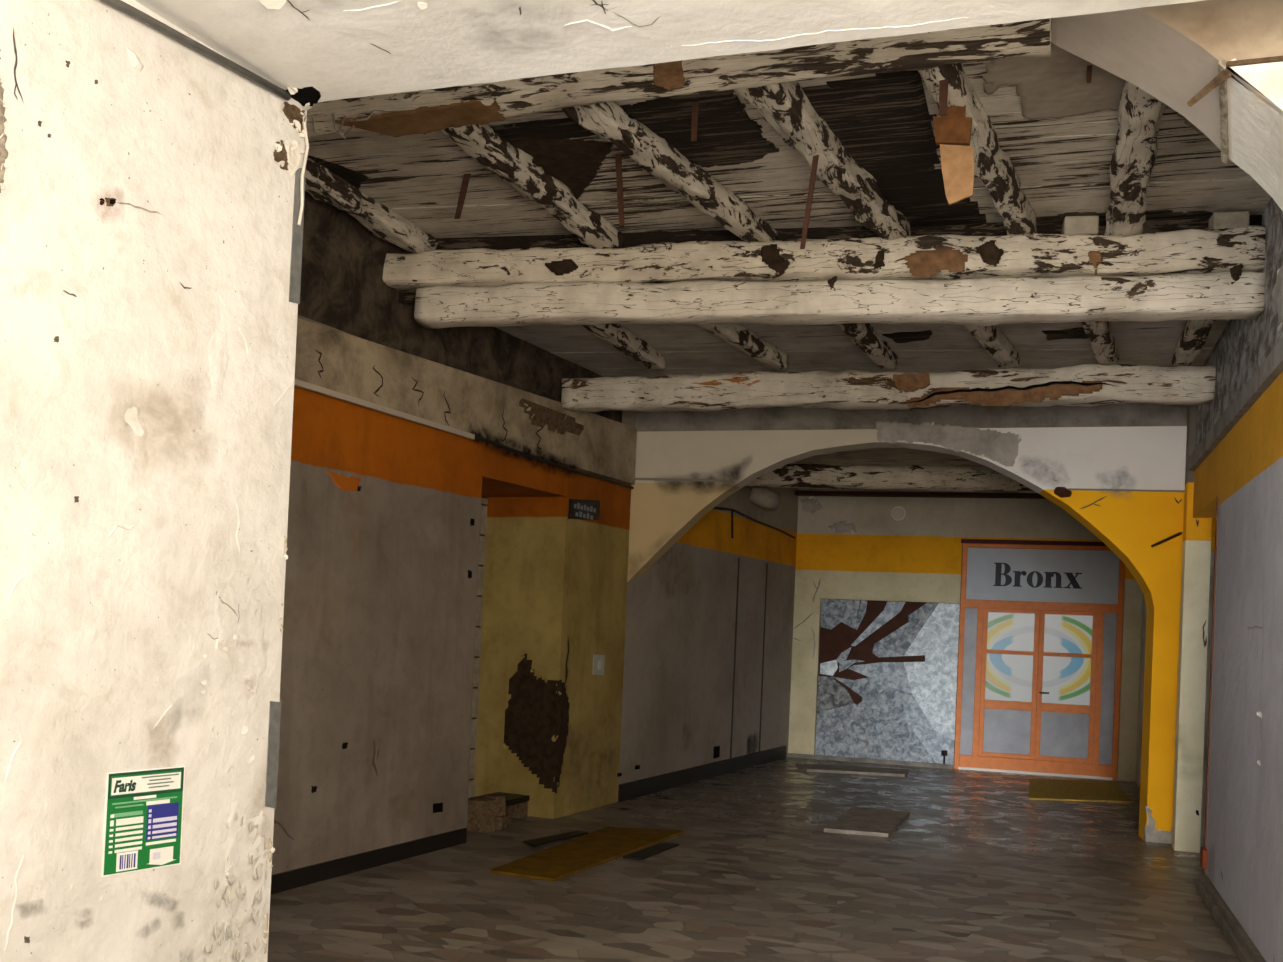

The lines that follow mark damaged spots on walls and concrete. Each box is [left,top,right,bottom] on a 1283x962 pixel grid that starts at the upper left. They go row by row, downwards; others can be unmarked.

flaking render [0,79,11,204]
peeling [273,86,369,190]
peeling [335,98,614,200]
peeling [621,17,966,168]
peeling [801,70,991,227]
peeling [545,259,578,276]
peeling [761,244,790,274]
peeling [874,250,885,268]
peeling [905,240,1004,278]
peeling [1036,212,1107,223]
peeling [1230,263,1243,284]
flaking render [502,653,571,793]